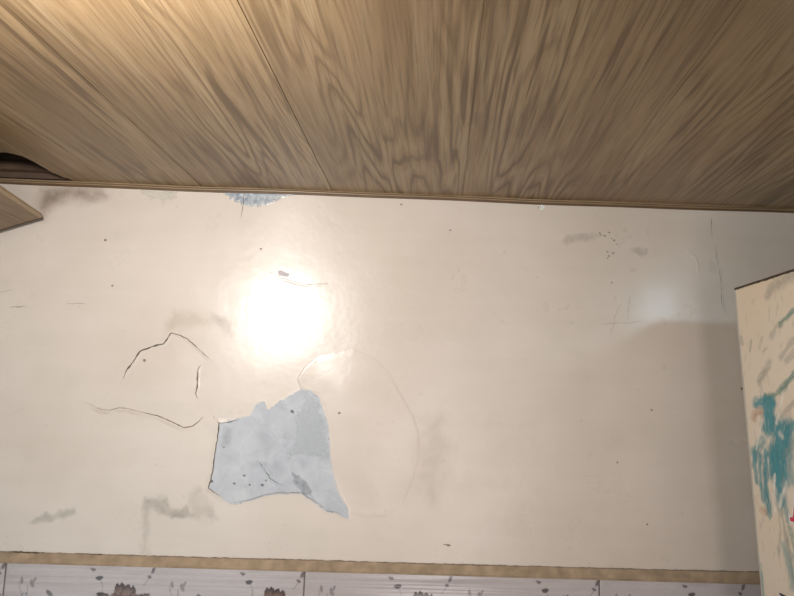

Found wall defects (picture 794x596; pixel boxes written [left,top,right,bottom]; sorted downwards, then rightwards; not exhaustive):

spalling [224,193,292,216]
crack [75,332,213,432]
spalling [200,387,351,521]